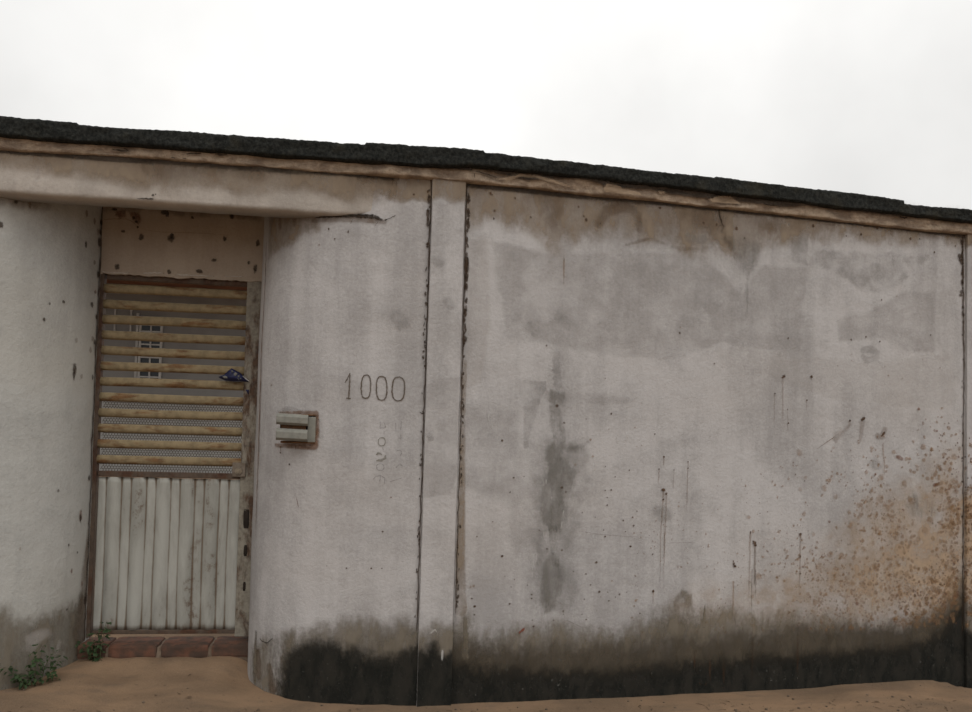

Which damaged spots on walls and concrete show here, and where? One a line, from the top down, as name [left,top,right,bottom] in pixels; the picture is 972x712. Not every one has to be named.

crack [316,214,394,222]
leakage [0,150,972,707]